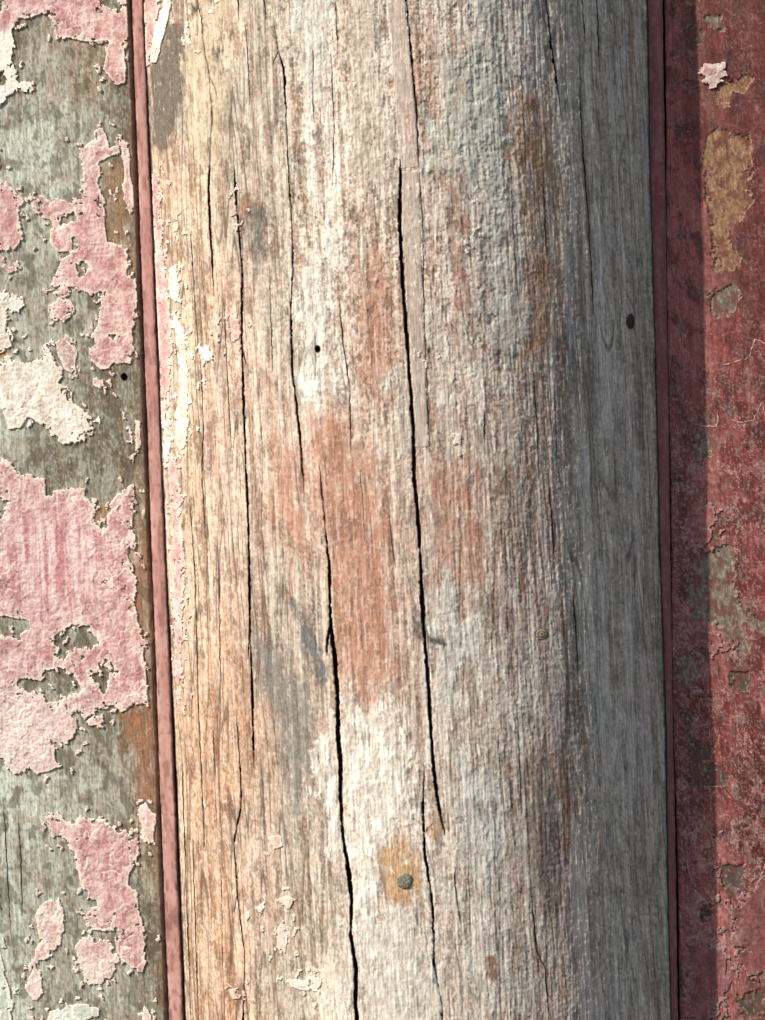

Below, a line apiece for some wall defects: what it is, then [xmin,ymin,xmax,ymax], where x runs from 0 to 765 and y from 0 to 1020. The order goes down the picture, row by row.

peeling [0,0,129,106]
peeling [684,62,755,108]
peeling [0,121,139,445]
peeling [701,127,756,319]
peeling [0,458,150,783]
peeling [152,164,252,716]
crack [237,0,359,1020]
crack [339,304,365,541]
crack [397,0,461,1020]
peeling [0,799,161,1020]
rust [378,838,419,906]
peeling [679,828,765,1020]